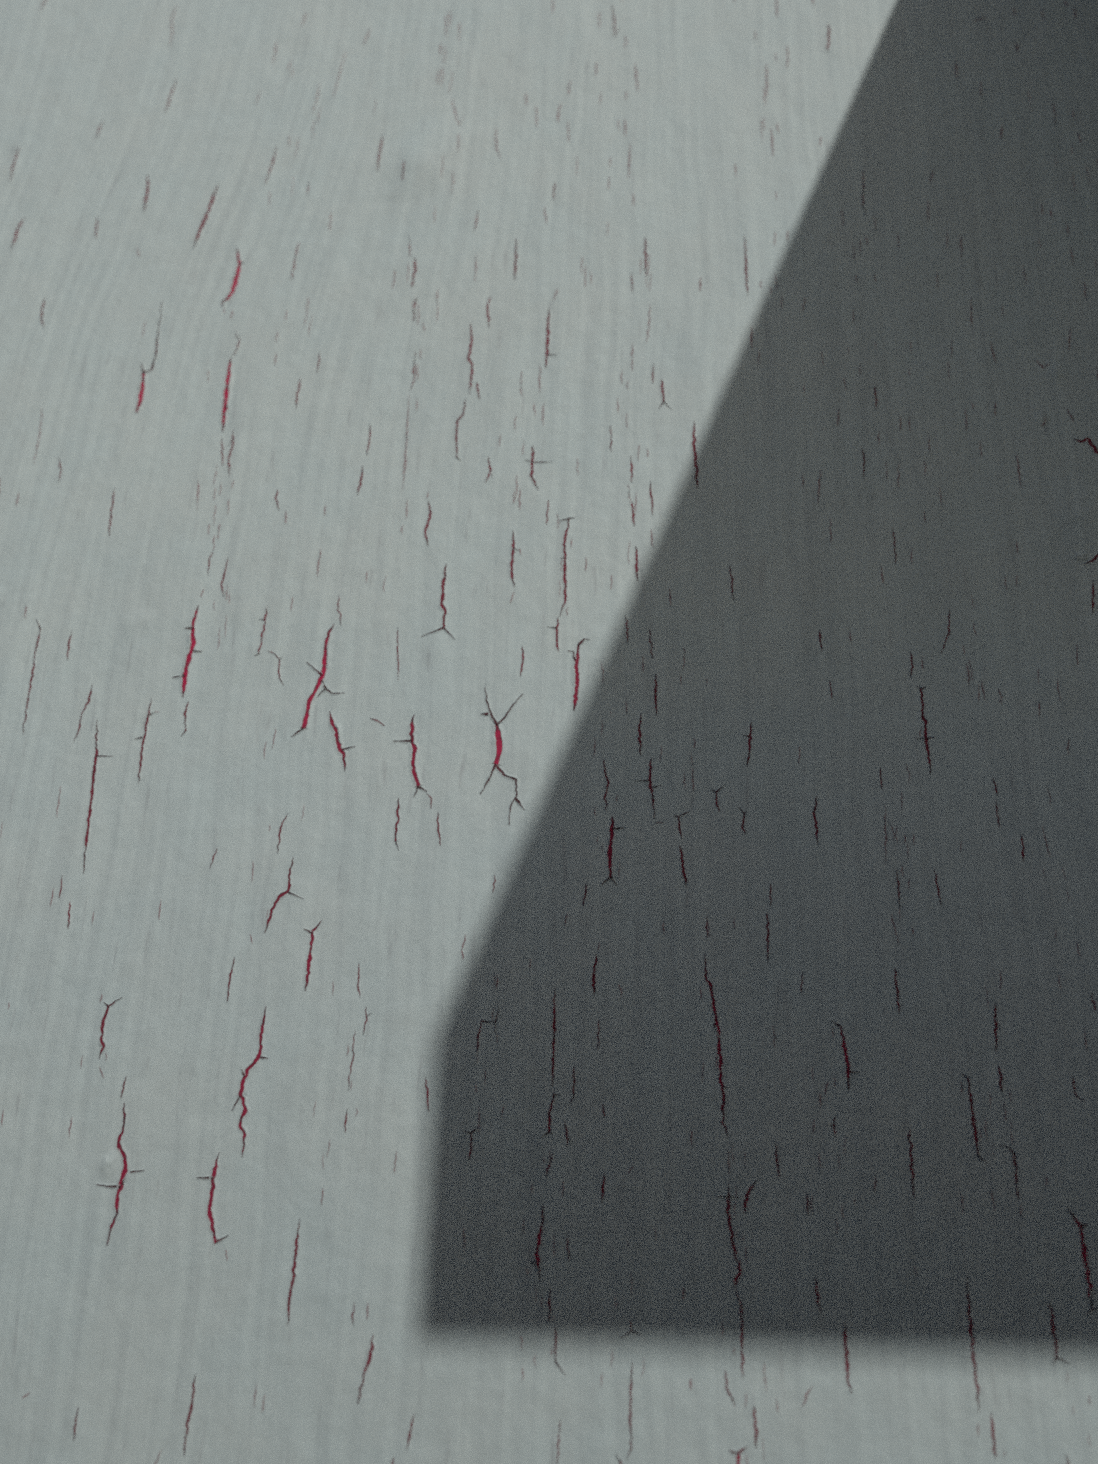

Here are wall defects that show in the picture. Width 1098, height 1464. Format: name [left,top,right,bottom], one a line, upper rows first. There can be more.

crack [0,0,754,929]
crack [743,191,806,368]
crack [754,0,832,156]
crack [801,89,1098,584]
crack [878,541,1098,1013]
crack [80,993,144,1246]
crack [153,1374,197,1464]
crack [196,804,372,1326]
crack [350,1302,376,1404]
crack [460,934,657,1464]
crack [688,883,917,1464]
crack [960,971,1098,1464]